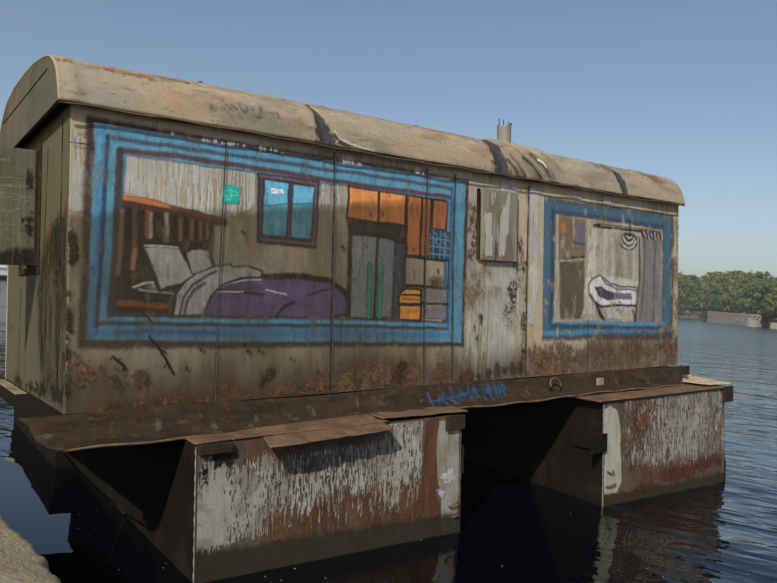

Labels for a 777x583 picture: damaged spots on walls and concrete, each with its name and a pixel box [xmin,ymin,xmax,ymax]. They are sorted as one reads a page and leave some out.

peeling [463,182,541,381]
peeling [196,420,424,554]
corrosion [260,420,441,544]
peeling [436,420,460,516]
peeling [604,389,724,495]
corrosion [632,398,722,492]